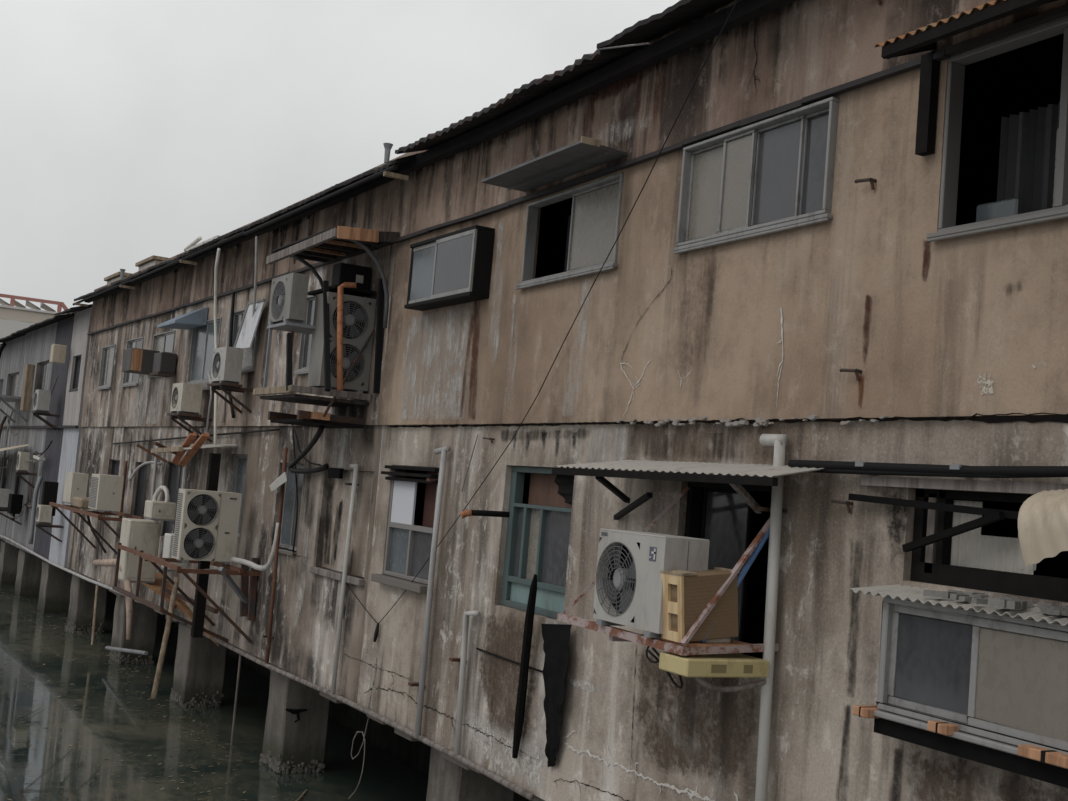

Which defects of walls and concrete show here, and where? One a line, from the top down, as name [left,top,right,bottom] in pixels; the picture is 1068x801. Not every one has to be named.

damp [893,751,1043,801]